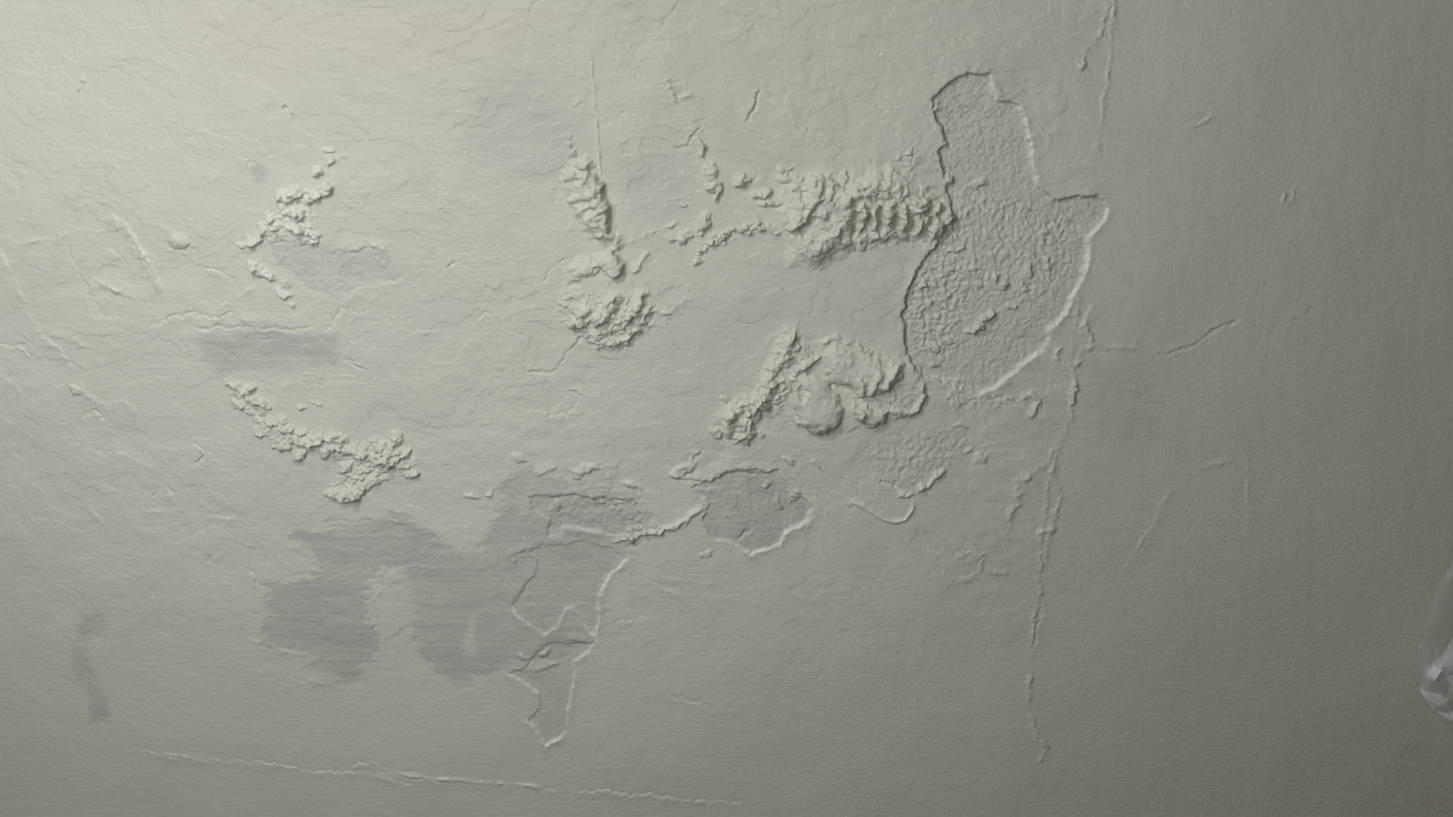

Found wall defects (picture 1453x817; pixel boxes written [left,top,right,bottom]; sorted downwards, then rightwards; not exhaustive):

peeling [893,68,1114,414]
water stain [258,455,587,696]
peeling [509,444,822,559]
peeling [845,496,917,526]